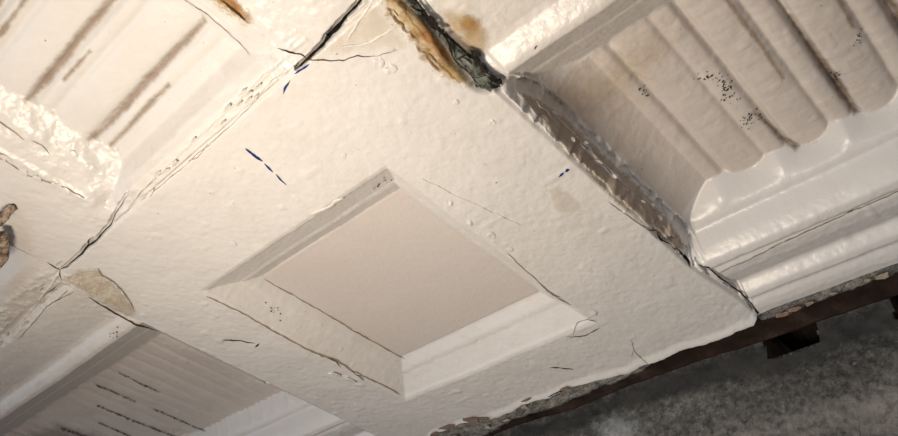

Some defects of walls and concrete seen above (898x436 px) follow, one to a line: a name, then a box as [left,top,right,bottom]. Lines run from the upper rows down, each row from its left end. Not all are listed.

rust [216,0,249,24]
rust [385,0,472,86]
crack [0,153,84,198]
crack [47,0,393,278]
peeling [521,95,683,248]
crack [609,191,898,314]
spalling [0,268,135,345]